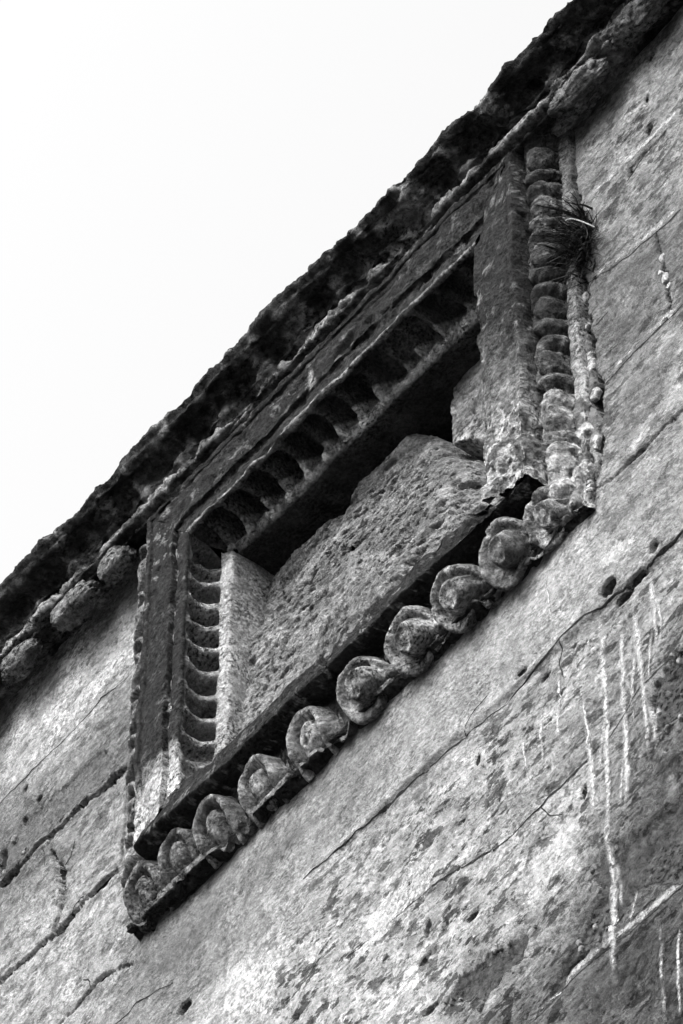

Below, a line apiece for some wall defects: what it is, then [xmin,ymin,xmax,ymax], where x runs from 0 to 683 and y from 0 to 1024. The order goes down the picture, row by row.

crack [40,839,111,948]
crack [303,530,683,879]
crack [345,651,683,959]
water stain [583,625,629,806]
water stain [583,826,680,1020]
water stain [620,583,680,794]